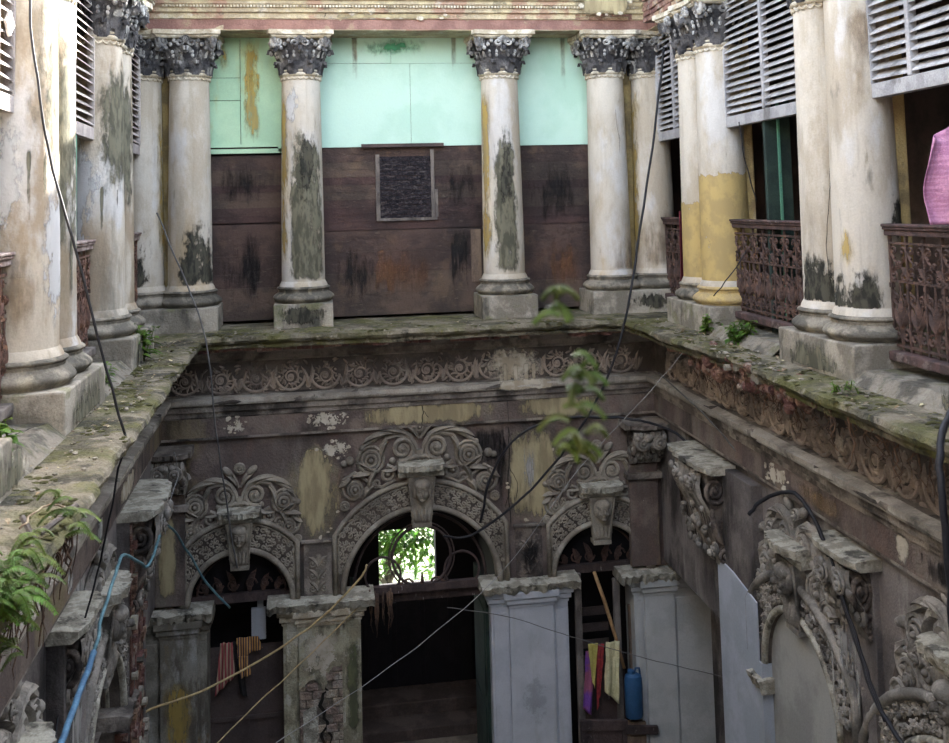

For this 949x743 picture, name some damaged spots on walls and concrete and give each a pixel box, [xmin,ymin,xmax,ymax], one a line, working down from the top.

leakage [245,50,259,135]
flaking render [294,411,351,539]
flaking render [299,632,344,743]
crack [318,687,333,743]